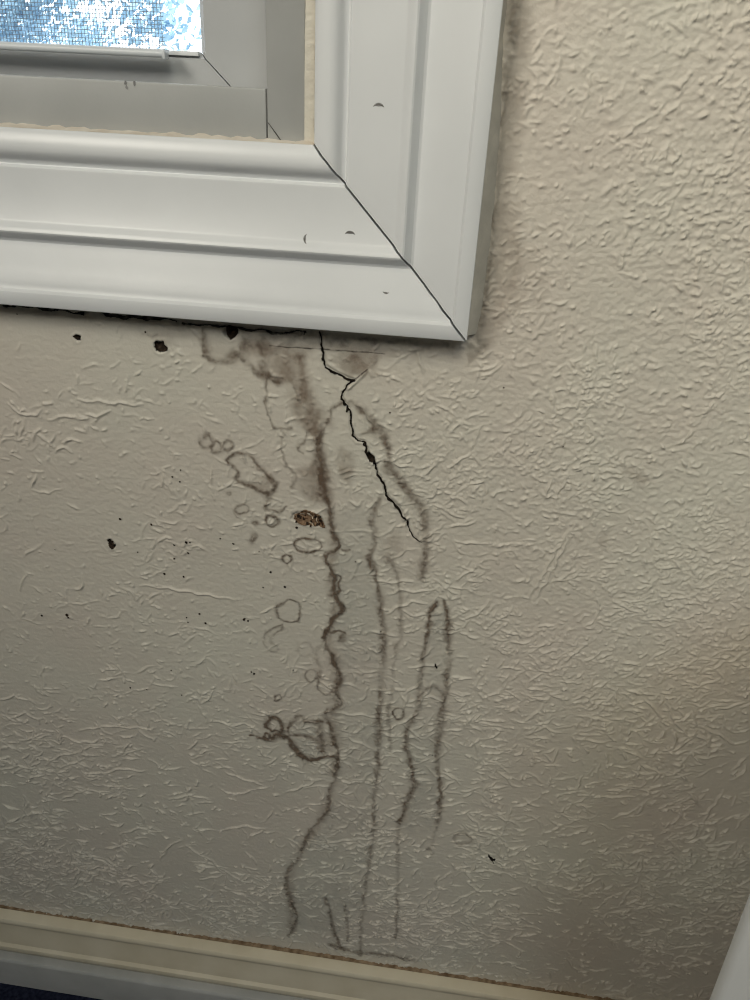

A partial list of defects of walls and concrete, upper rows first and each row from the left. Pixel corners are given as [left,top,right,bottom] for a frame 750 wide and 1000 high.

crack [2,305,422,543]
damp [226,452,277,512]
peeling [294,510,325,529]
damp [371,420,411,494]
damp [249,380,346,768]
damp [366,554,384,650]
damp [421,600,451,659]
damp [396,721,415,824]